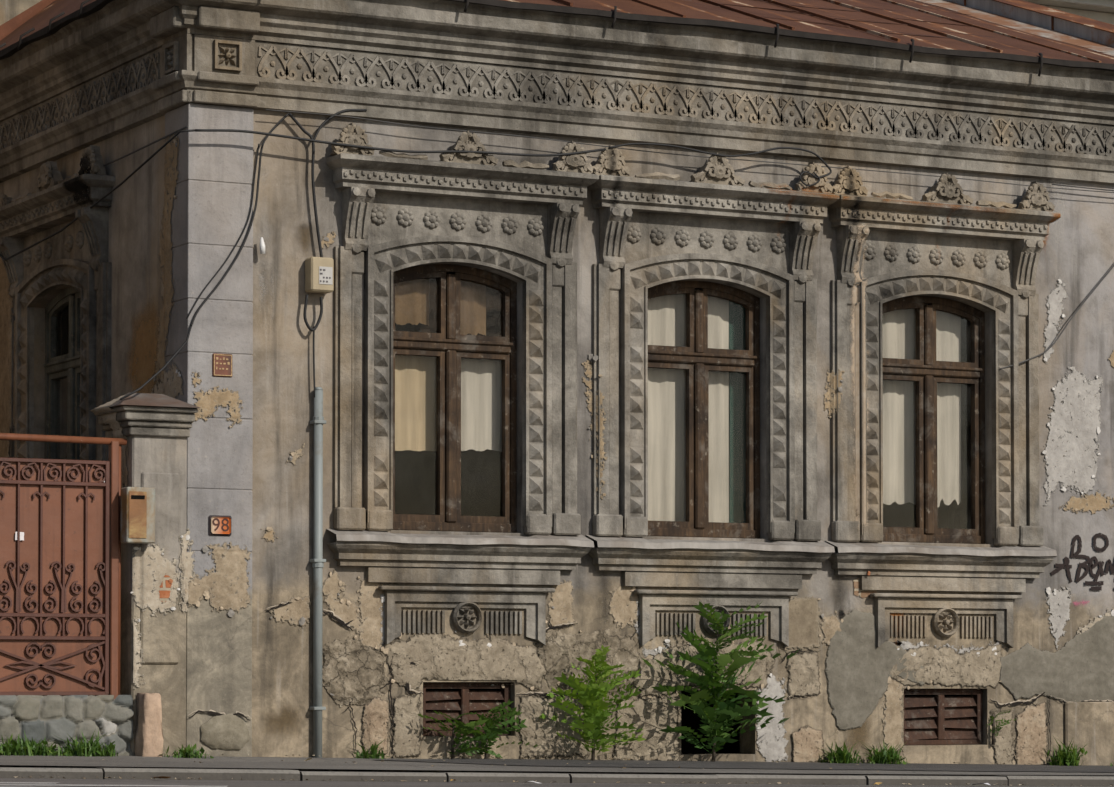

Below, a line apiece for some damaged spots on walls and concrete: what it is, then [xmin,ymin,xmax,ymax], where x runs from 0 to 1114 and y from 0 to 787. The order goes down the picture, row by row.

peeling [1043,279,1068,364]
peeling [90,395,129,488]
peeling [151,362,243,428]
peeling [1042,366,1114,514]
spalling [130,528,251,689]
peeling [1045,586,1114,649]
spalling [267,570,844,762]
spalling [881,641,1003,755]
flaking render [991,701,1048,765]